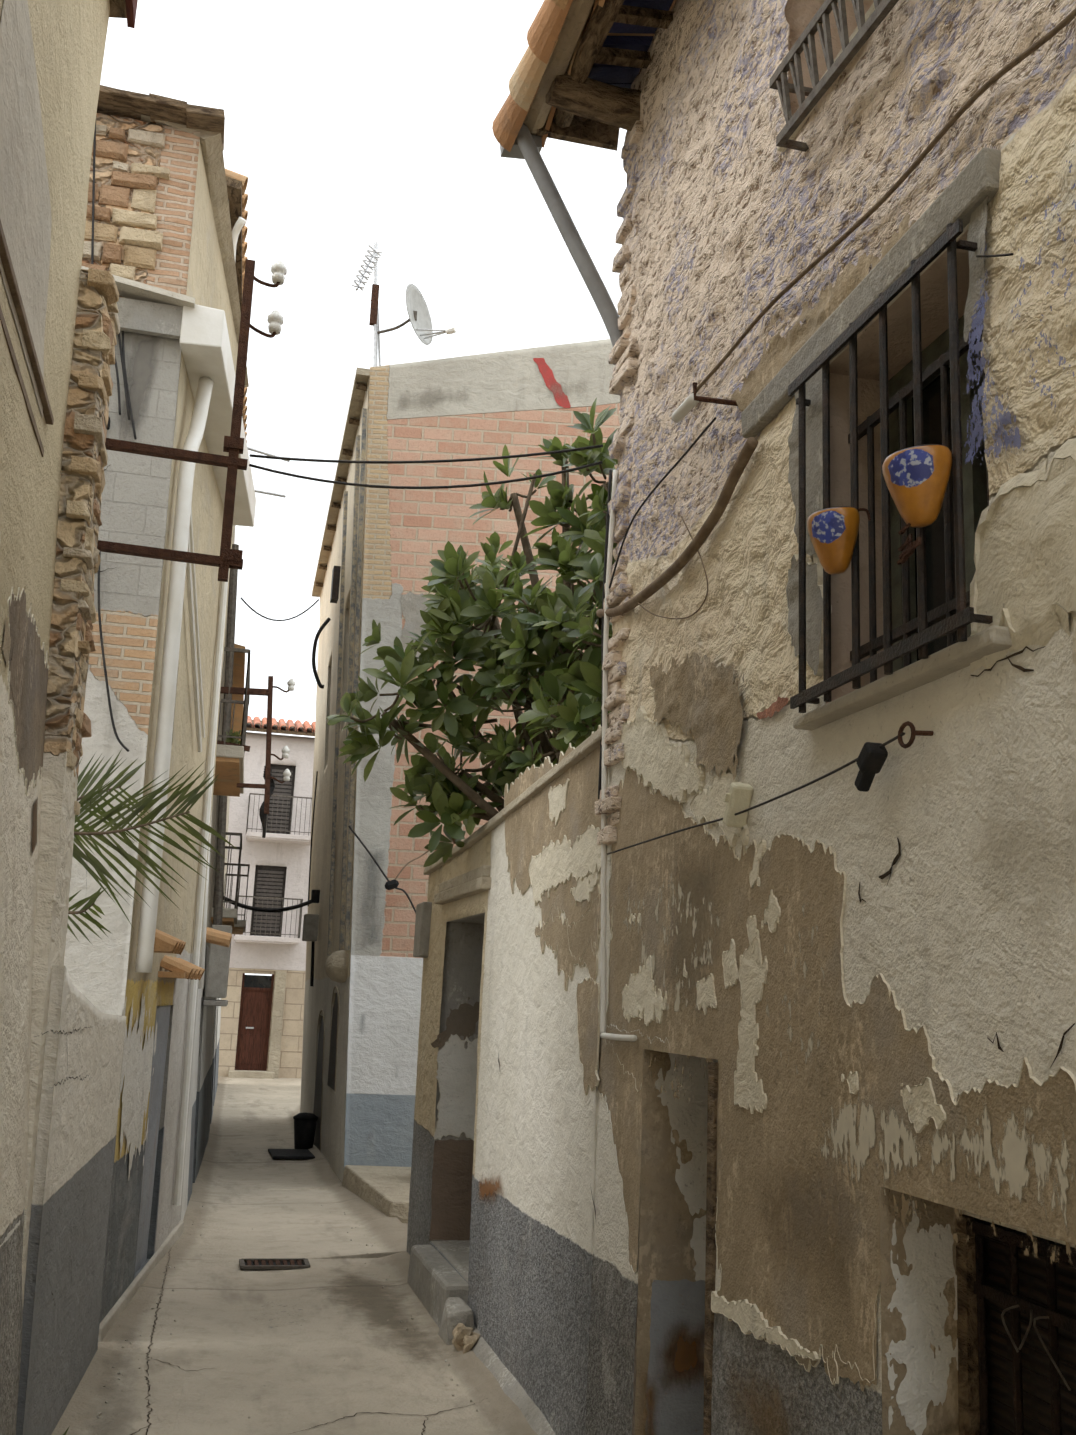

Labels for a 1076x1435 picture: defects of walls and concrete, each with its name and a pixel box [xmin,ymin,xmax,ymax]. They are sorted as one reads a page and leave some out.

peeling [7,587,49,796]
peeling [431,997,480,1048]
peeling [504,652,1076,1435]
crack [130,1250,213,1435]
crack [286,1398,487,1435]
rust [665,1327,704,1381]